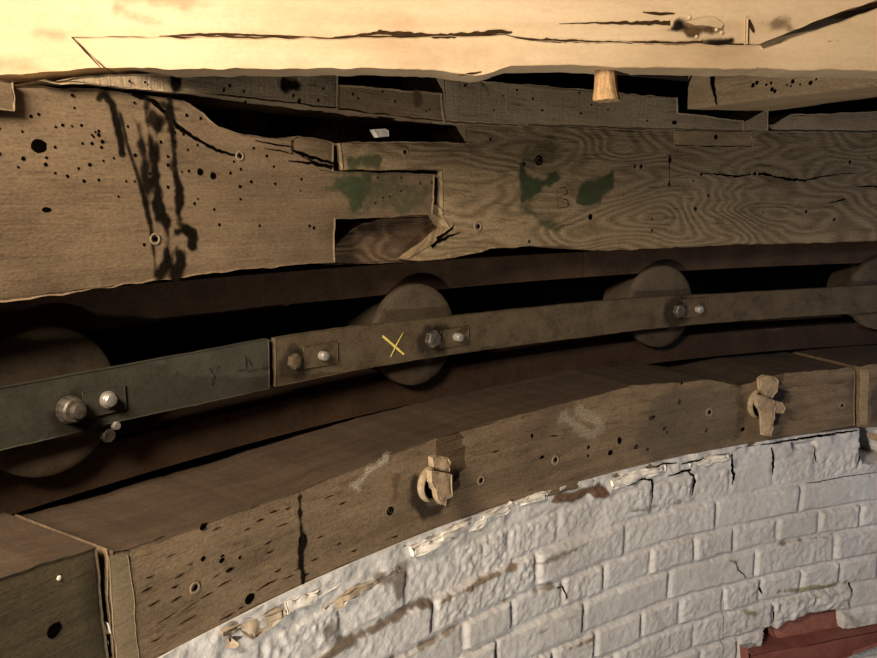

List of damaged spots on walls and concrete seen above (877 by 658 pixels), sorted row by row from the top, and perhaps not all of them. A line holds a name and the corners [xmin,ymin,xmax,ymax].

crack [131,91,238,156]
crack [255,140,333,172]
crack [703,172,877,204]
crack [760,430,877,483]
peeling [551,483,610,503]
crack [628,454,735,504]
peeling [375,562,406,599]
spalling [764,609,838,638]